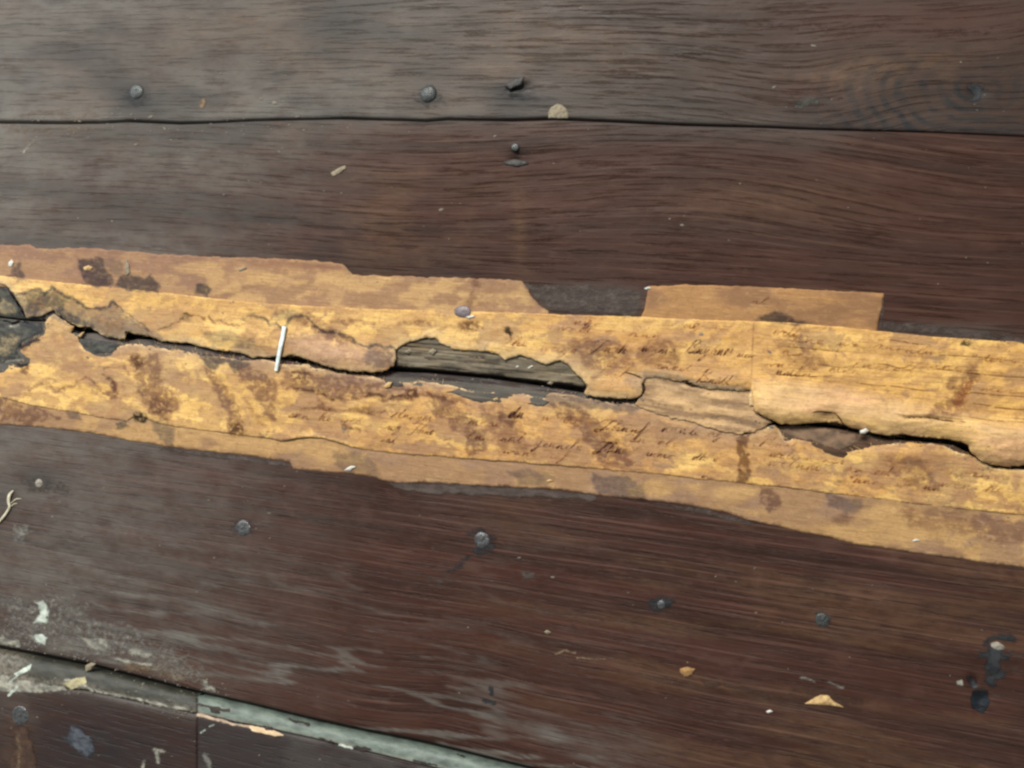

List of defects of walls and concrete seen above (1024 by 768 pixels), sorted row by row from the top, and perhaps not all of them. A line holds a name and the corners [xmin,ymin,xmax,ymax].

crack [0,289,99,334]
crack [125,331,320,365]
crack [346,366,586,393]
crack [765,417,1024,466]